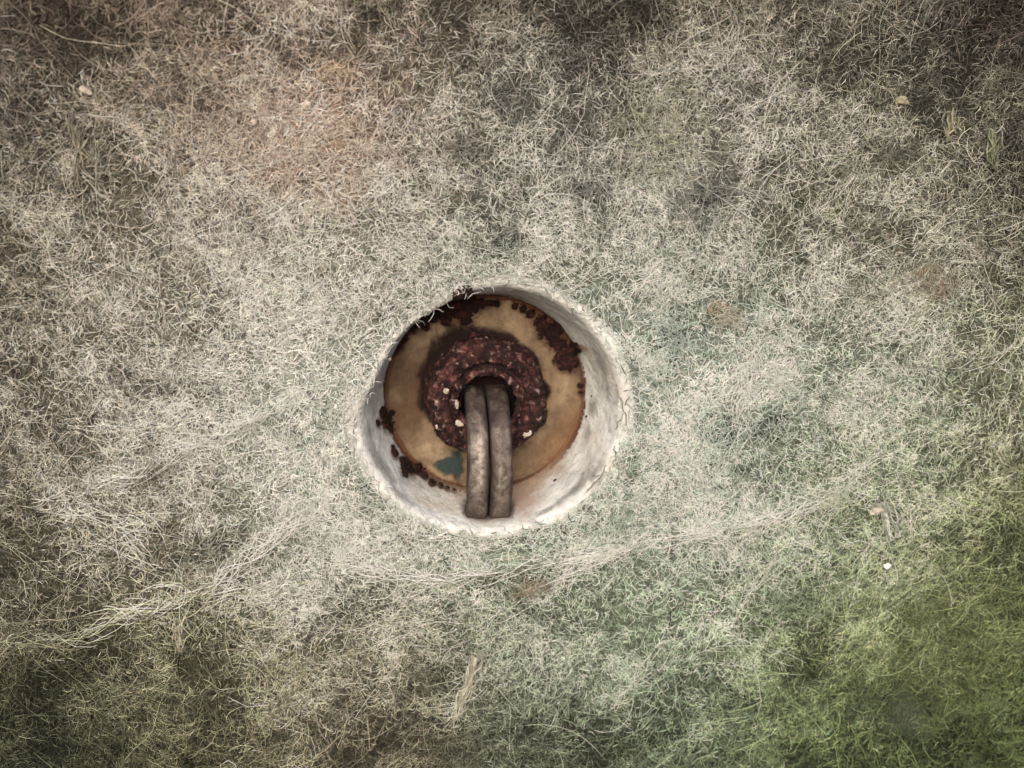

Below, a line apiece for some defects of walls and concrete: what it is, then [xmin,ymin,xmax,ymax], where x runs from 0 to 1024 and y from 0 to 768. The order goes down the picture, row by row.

corrosion [376,282,592,520]